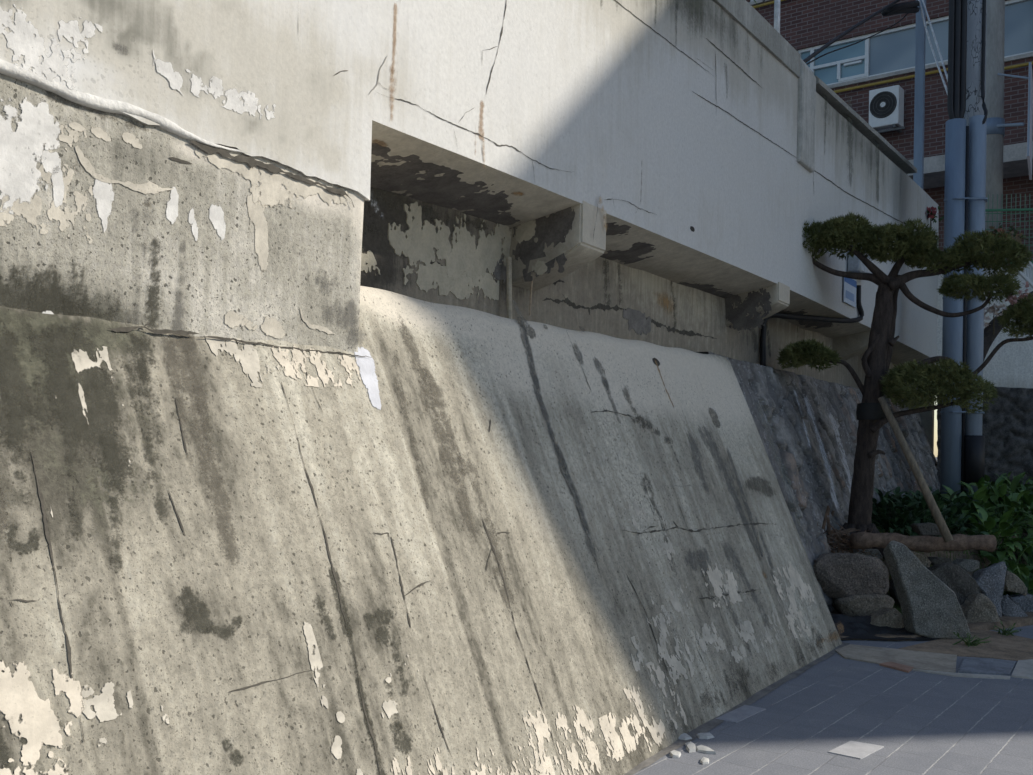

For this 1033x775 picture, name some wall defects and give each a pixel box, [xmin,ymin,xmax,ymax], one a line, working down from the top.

peeling [0,97,142,244]
crack [368,0,568,182]
peeling [370,143,575,316]
damp [28,264,90,473]
damp [126,239,239,562]
damp [6,524,39,554]
crack [11,452,74,680]
peeling [0,661,133,775]
damp [100,430,123,568]
crack [281,382,381,775]
peeling [470,563,816,775]
crack [624,485,770,550]